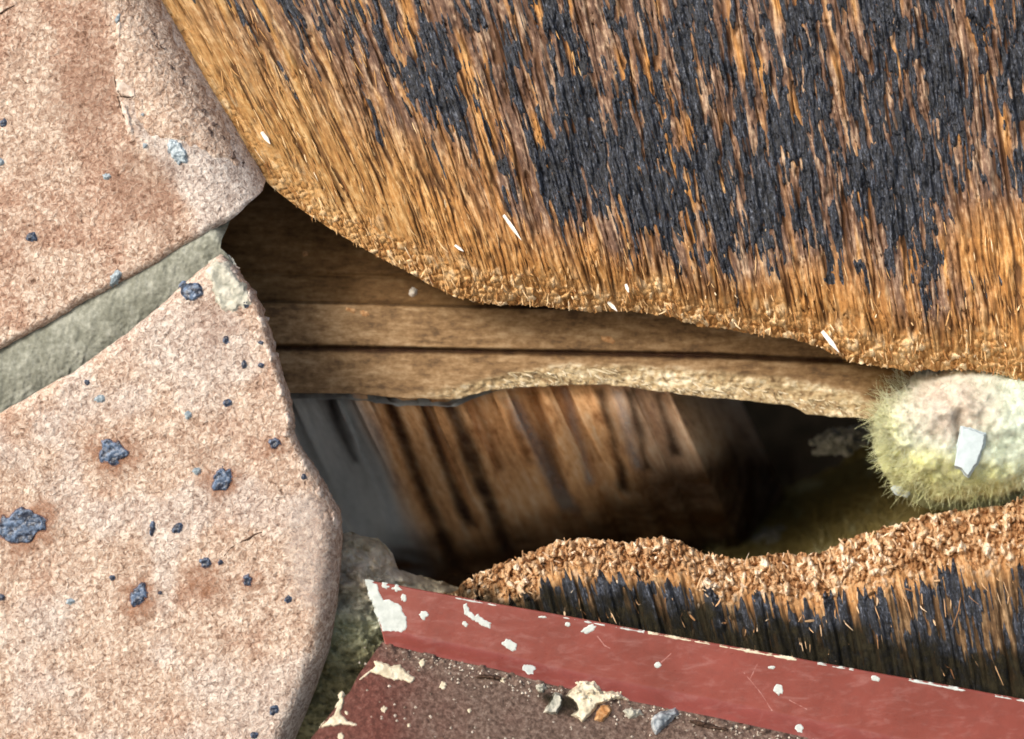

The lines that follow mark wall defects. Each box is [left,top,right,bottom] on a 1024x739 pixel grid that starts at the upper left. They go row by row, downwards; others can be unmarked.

peeling [365,579,429,632]
peeling [456,598,496,629]
peeling [319,691,357,739]
peeling [359,659,425,683]
peeling [522,664,643,722]